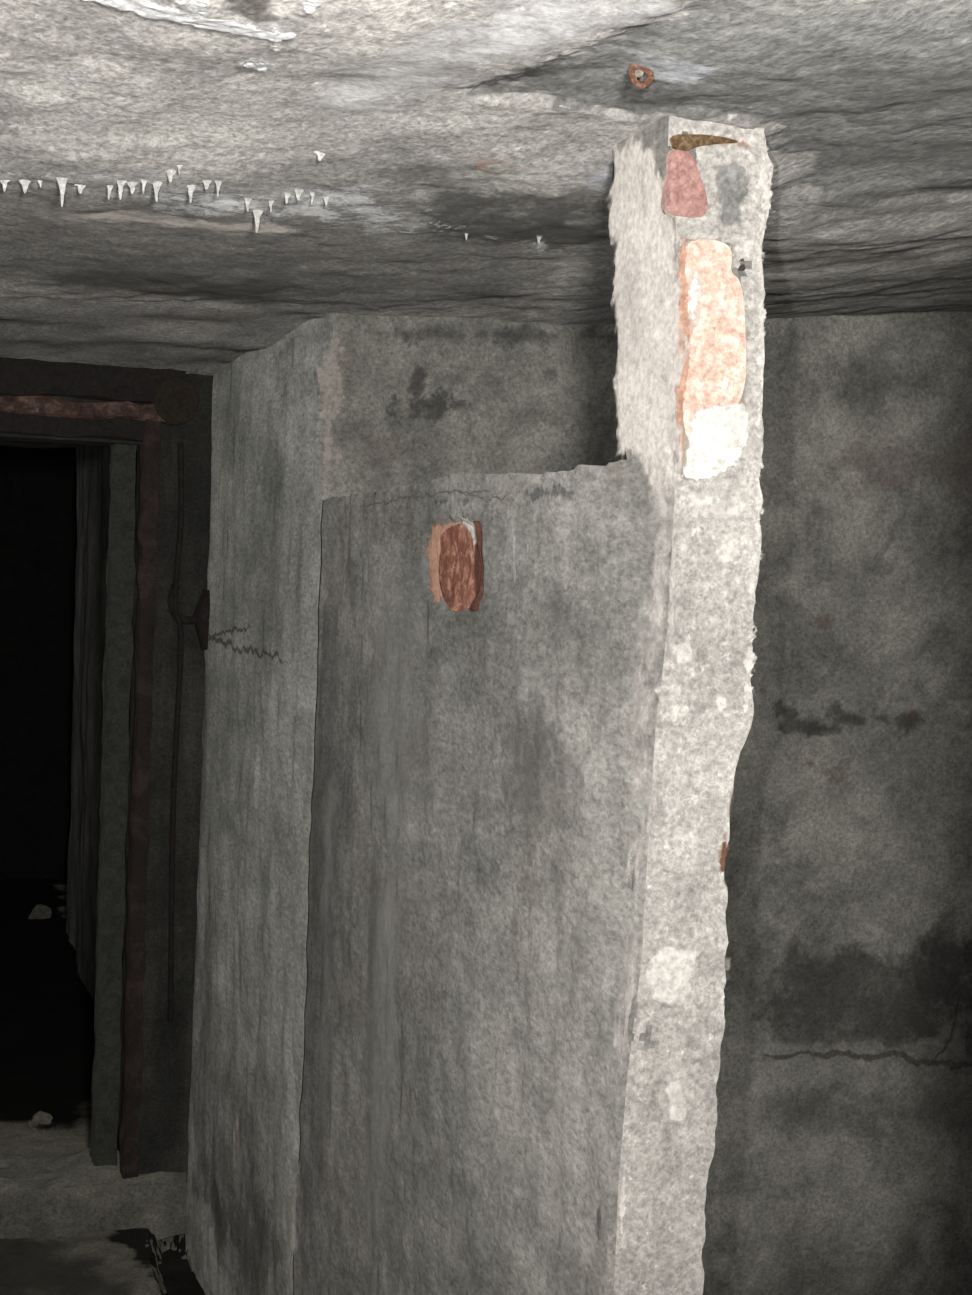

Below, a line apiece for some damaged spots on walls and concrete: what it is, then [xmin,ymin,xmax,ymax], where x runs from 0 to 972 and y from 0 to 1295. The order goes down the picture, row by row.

damp [83,0,296,73]
damp [302,0,324,14]
damp [34,168,608,253]
damp [717,162,749,224]
spalling [469,0,972,725]
flaking render [428,518,484,611]